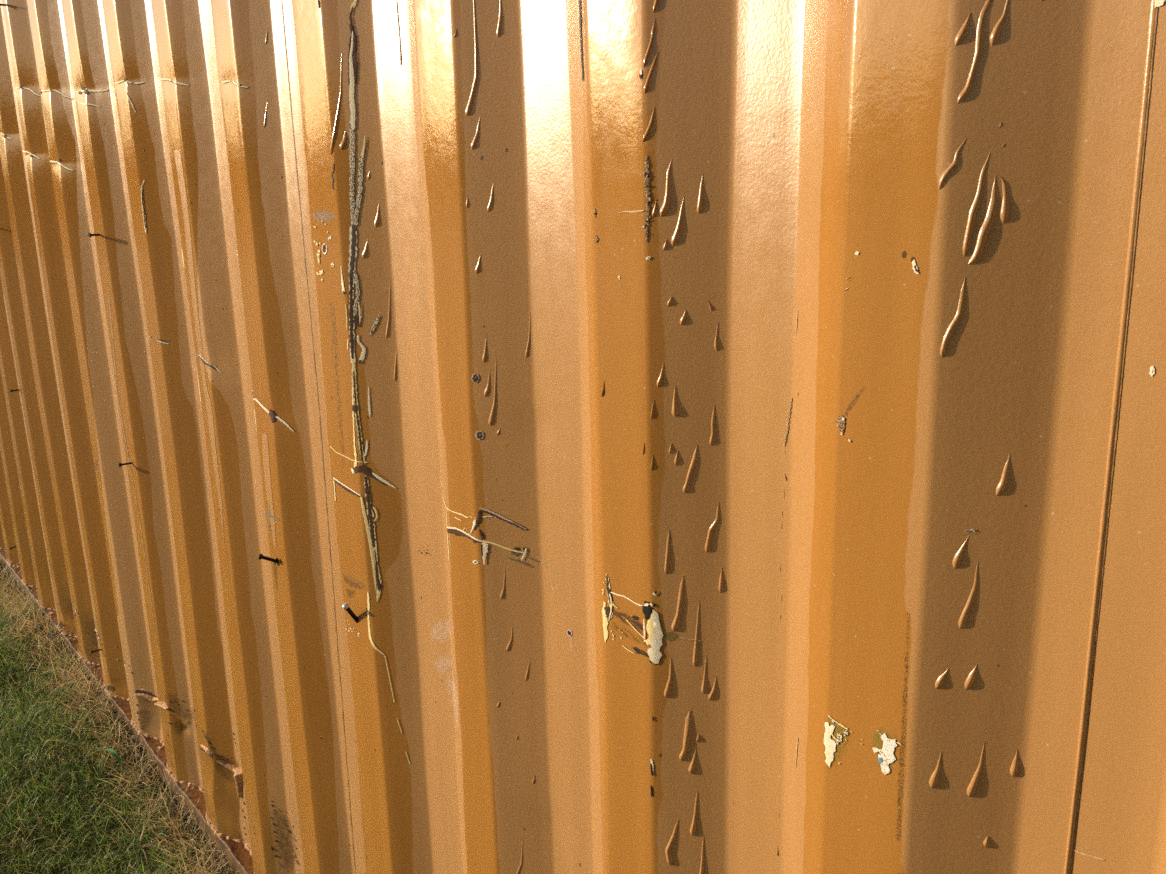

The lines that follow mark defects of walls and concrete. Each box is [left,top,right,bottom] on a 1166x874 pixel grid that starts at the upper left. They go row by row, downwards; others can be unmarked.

peeling [357,315,380,364]
spalling [443,499,551,568]
peeling [602,574,663,665]
peeling [824,715,901,775]